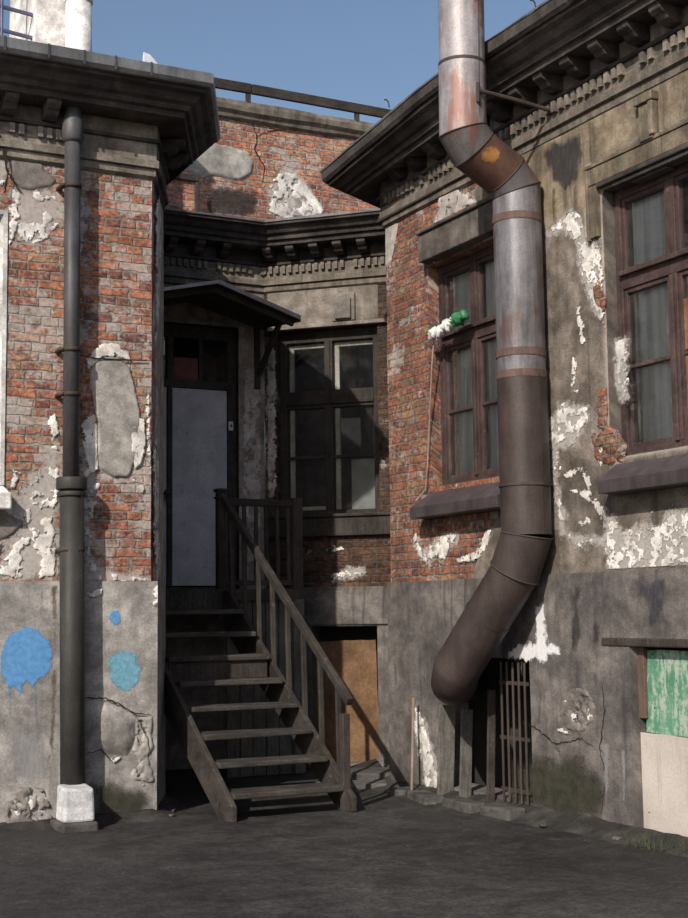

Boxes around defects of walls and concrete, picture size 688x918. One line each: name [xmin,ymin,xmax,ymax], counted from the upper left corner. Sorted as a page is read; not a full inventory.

peeling [0,160,63,245]
crack [252,124,285,179]
peeling [269,171,324,218]
corrosion [482,147,500,163]
peeling [544,209,606,344]
peeling [549,337,688,569]
peeling [0,414,61,581]
peeling [82,395,161,608]
crack [85,697,152,760]
peeling [414,707,437,788]
crack [521,686,610,813]